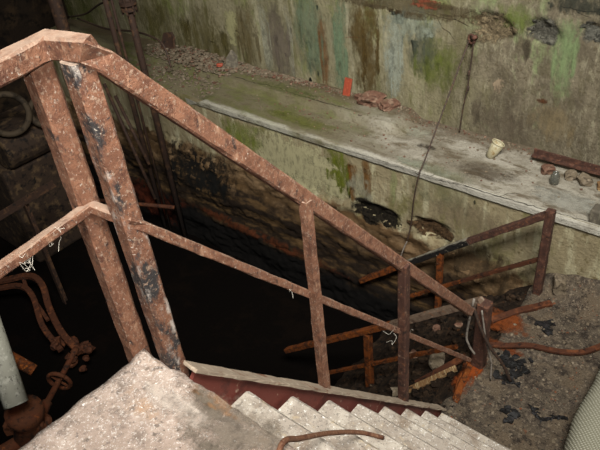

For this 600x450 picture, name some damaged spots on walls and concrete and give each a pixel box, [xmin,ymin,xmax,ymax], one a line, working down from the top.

corrosion [318,20,329,83]
spalling [527,17,560,47]
spalling [580,21,600,42]
spalling [53,60,102,189]
water stain [167,137,236,202]
spalling [99,75,308,289]
spalling [165,88,544,300]
spalling [314,216,398,322]
spalling [410,279,450,315]
spalling [546,222,600,280]